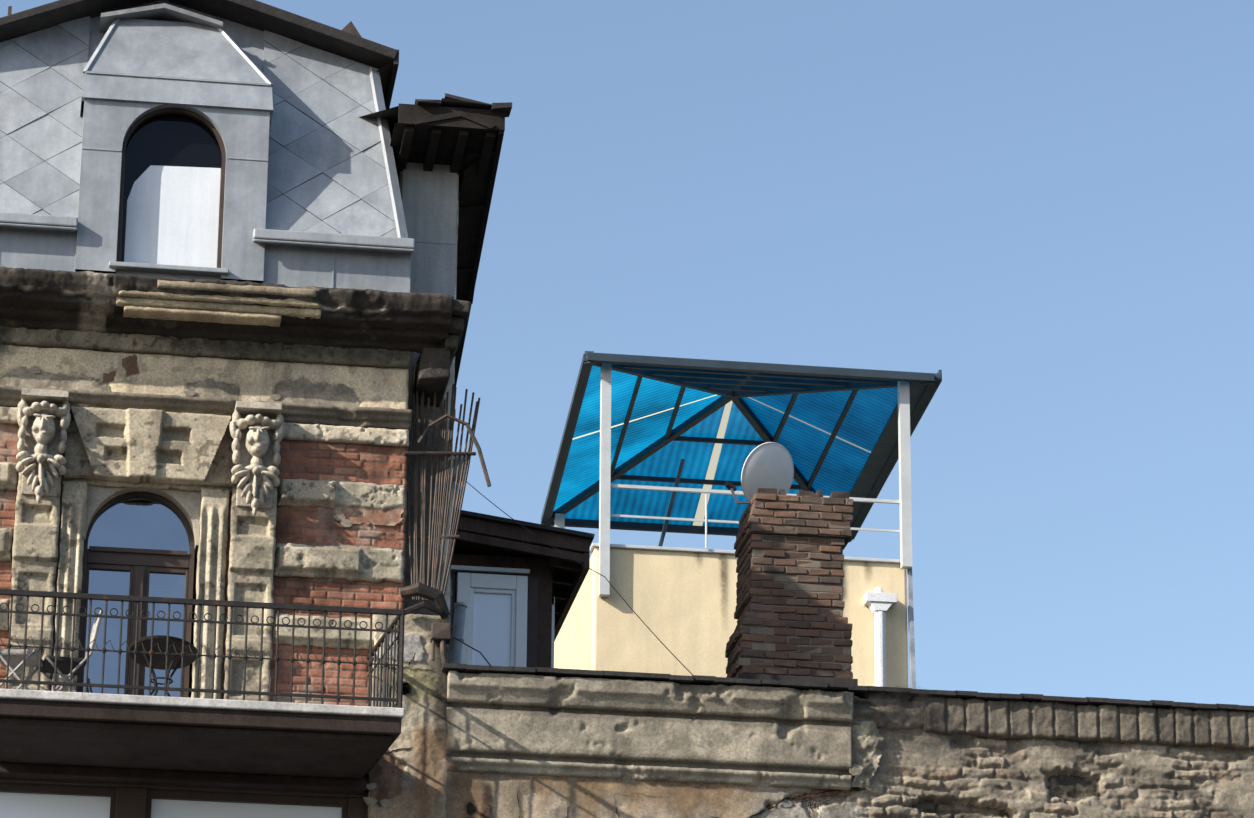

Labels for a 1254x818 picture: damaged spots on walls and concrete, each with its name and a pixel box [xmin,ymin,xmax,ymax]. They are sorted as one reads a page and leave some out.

peeling [0,355,140,407]
peeling [270,376,361,408]
spalling [363,752,405,807]
crack [750,790,836,818]